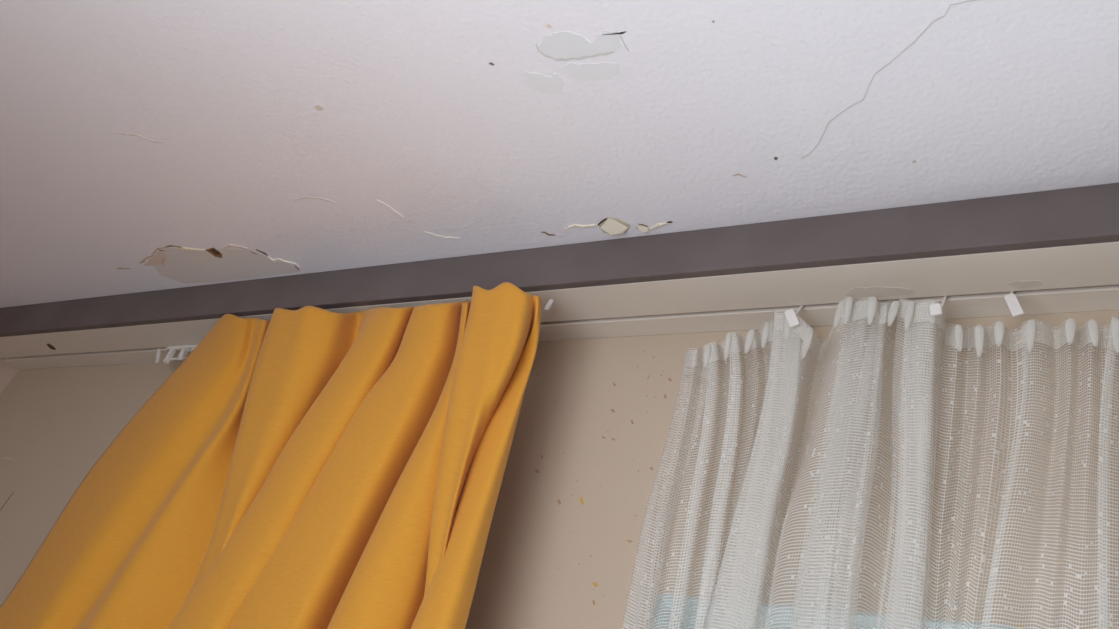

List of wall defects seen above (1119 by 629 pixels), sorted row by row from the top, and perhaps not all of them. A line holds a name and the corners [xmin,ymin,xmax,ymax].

crack [801,0,976,159]
peeling [564,217,668,236]
flaking render [152,244,300,284]